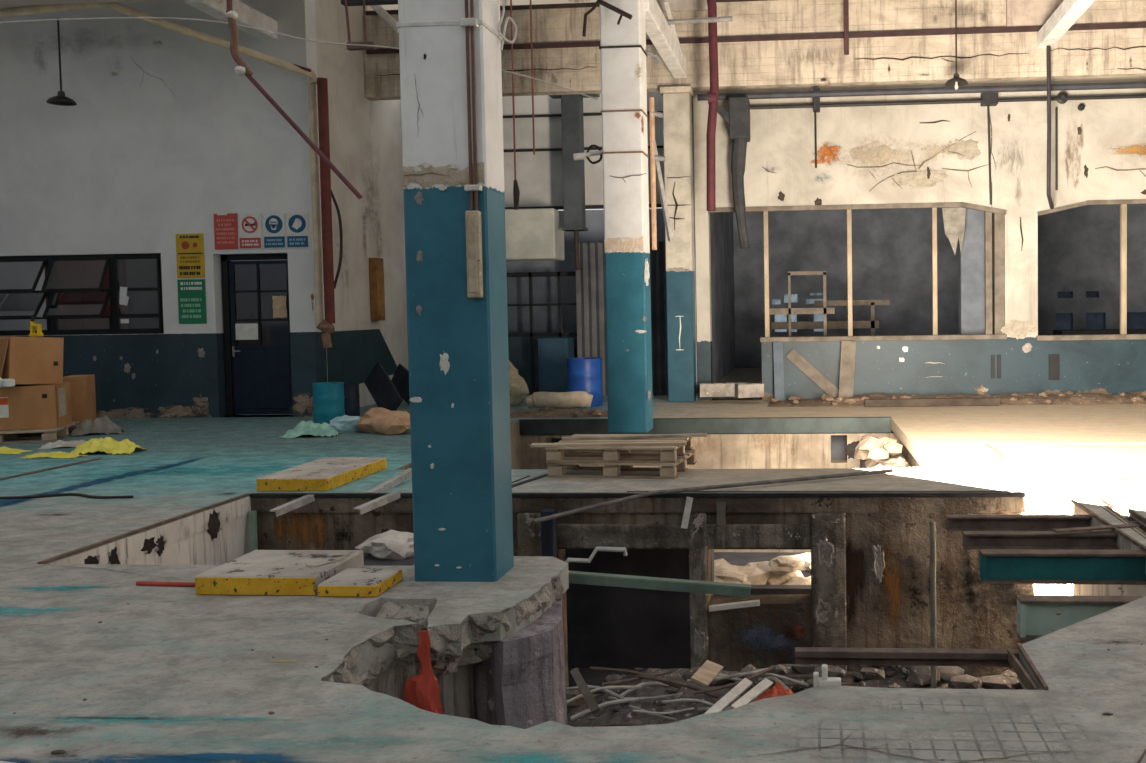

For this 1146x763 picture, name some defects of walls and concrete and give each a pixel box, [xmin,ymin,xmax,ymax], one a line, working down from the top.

crack [848,111,996,192]
peeling [401,162,485,205]
peeling [439,351,450,375]
peeling [96,395,209,418]